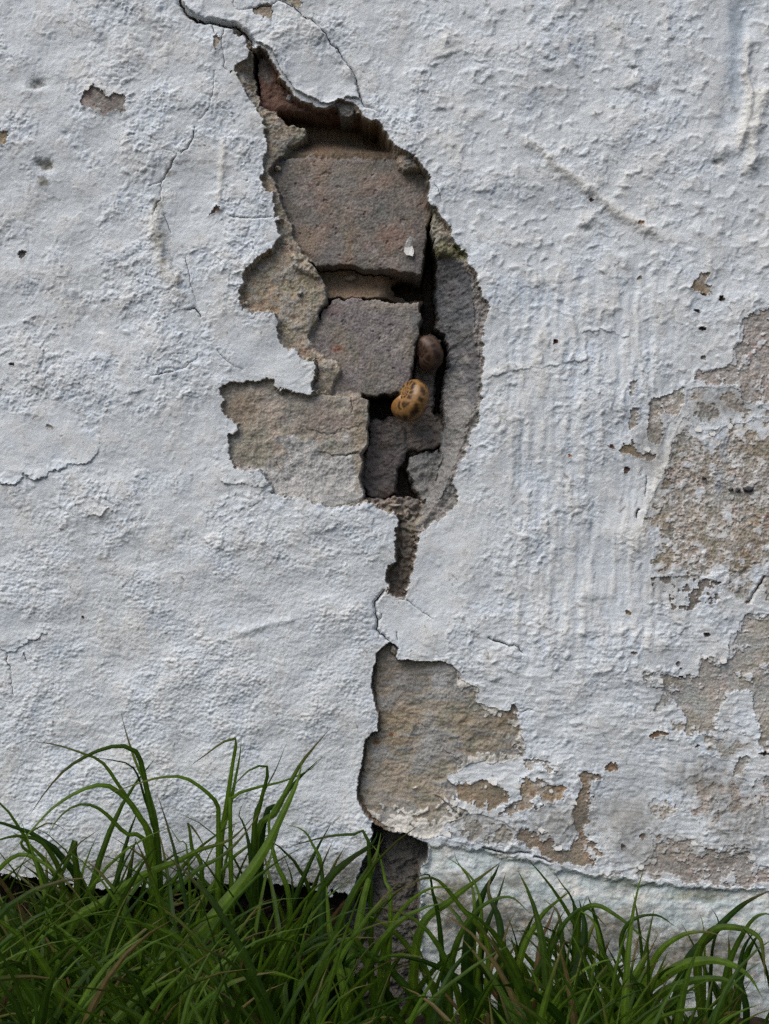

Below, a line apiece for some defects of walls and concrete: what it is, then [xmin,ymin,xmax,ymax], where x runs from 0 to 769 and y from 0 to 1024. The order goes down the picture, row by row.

peeling [80,84,126,114]
crack [152,0,378,232]
spalling [218,28,491,599]
peeling [691,272,726,301]
crack [374,591,433,641]
peeling [607,305,769,890]
spalling [343,642,619,1010]